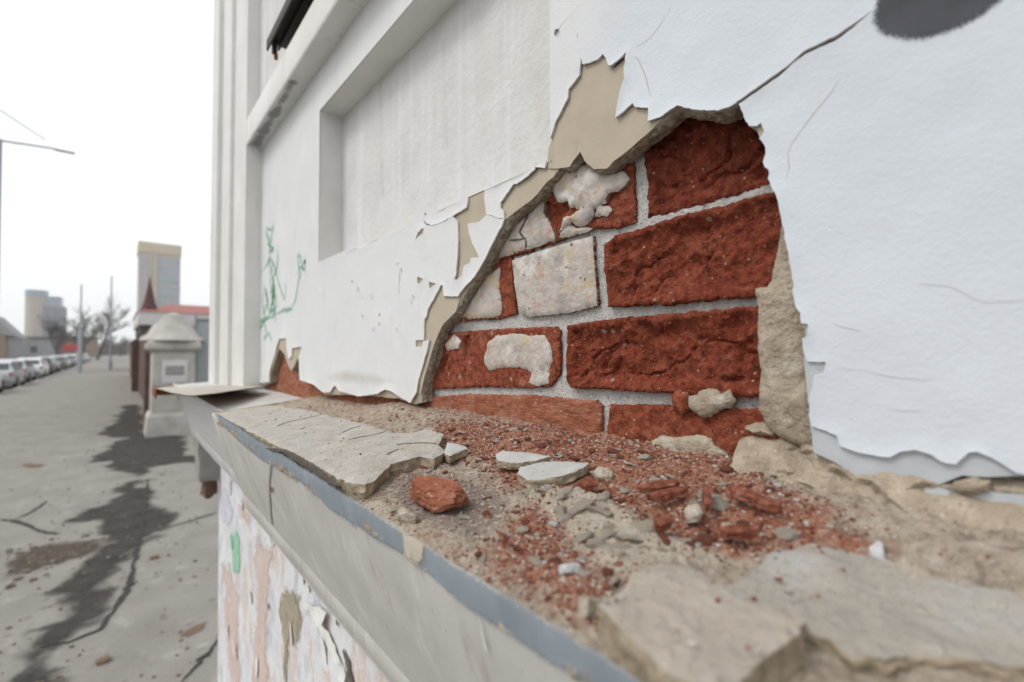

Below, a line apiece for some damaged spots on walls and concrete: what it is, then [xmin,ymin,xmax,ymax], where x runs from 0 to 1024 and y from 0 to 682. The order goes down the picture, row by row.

crack [786,77,841,179]
flaking render [265,56,1024,534]
peeling [200,479,250,525]
peeling [214,413,639,682]